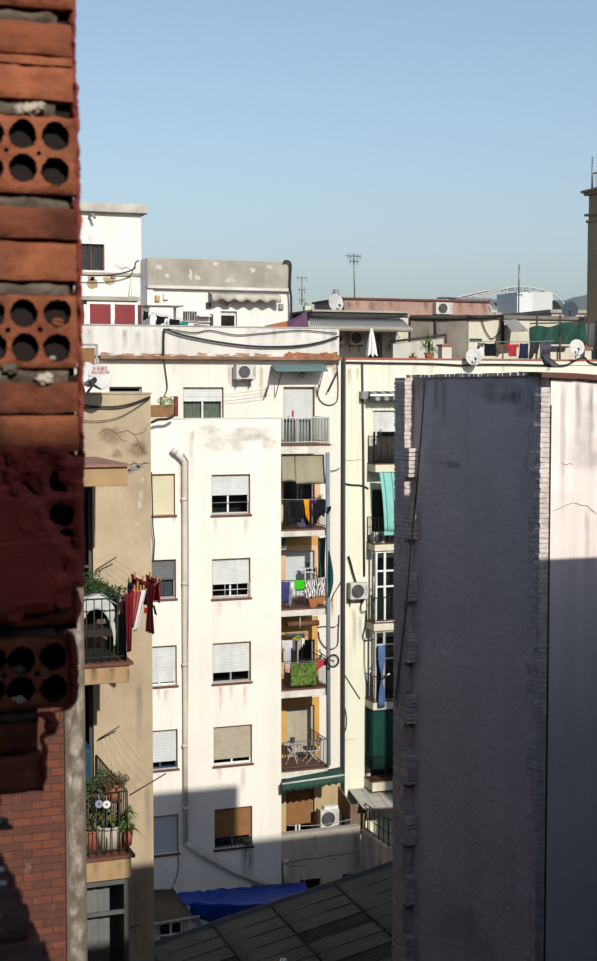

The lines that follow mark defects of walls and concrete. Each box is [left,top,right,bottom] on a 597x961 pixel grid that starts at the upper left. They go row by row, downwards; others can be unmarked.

peeling [0,0,131,790]
crack [98,425,152,465]
peeling [71,823,84,896]
peeling [70,909,83,961]